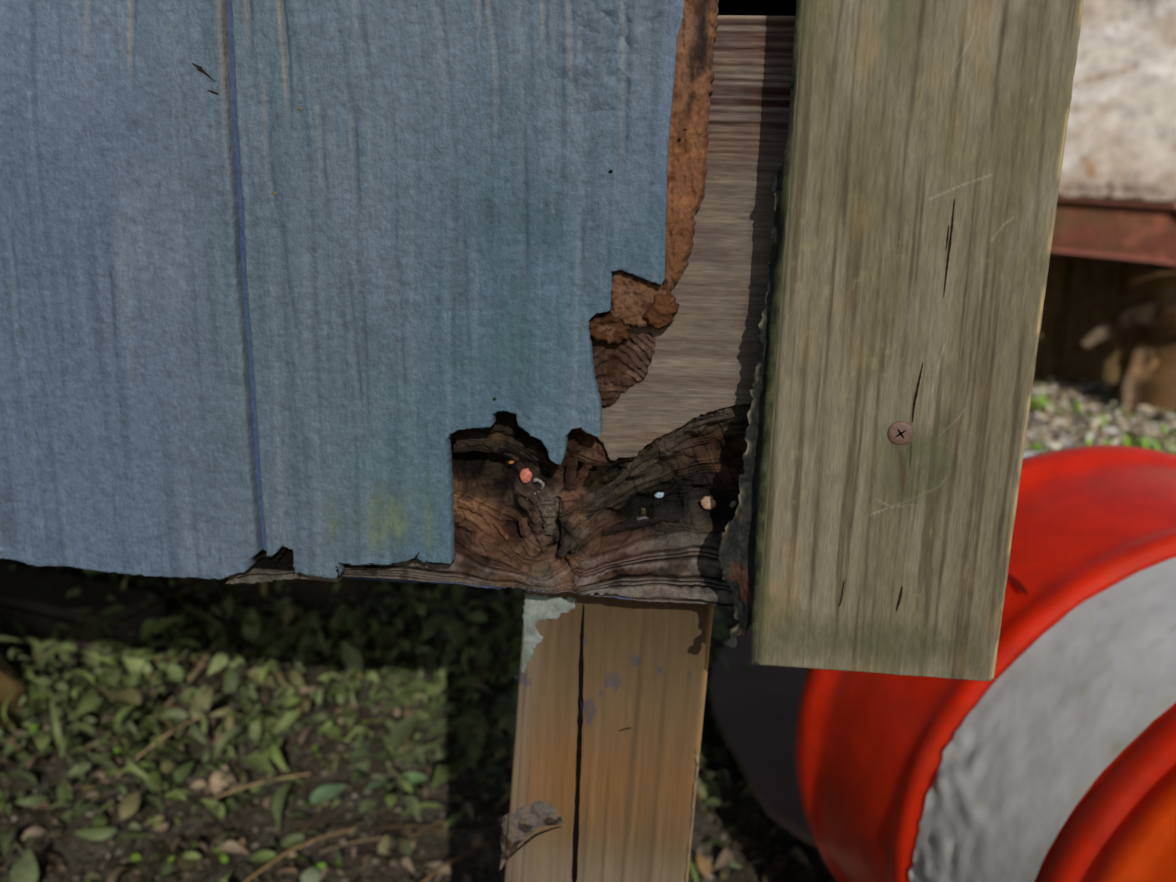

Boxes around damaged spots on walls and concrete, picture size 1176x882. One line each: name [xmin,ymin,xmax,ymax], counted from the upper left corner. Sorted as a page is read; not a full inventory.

peeling [589,0,719,407]
crack [944,199,955,293]
crack [508,605,584,882]